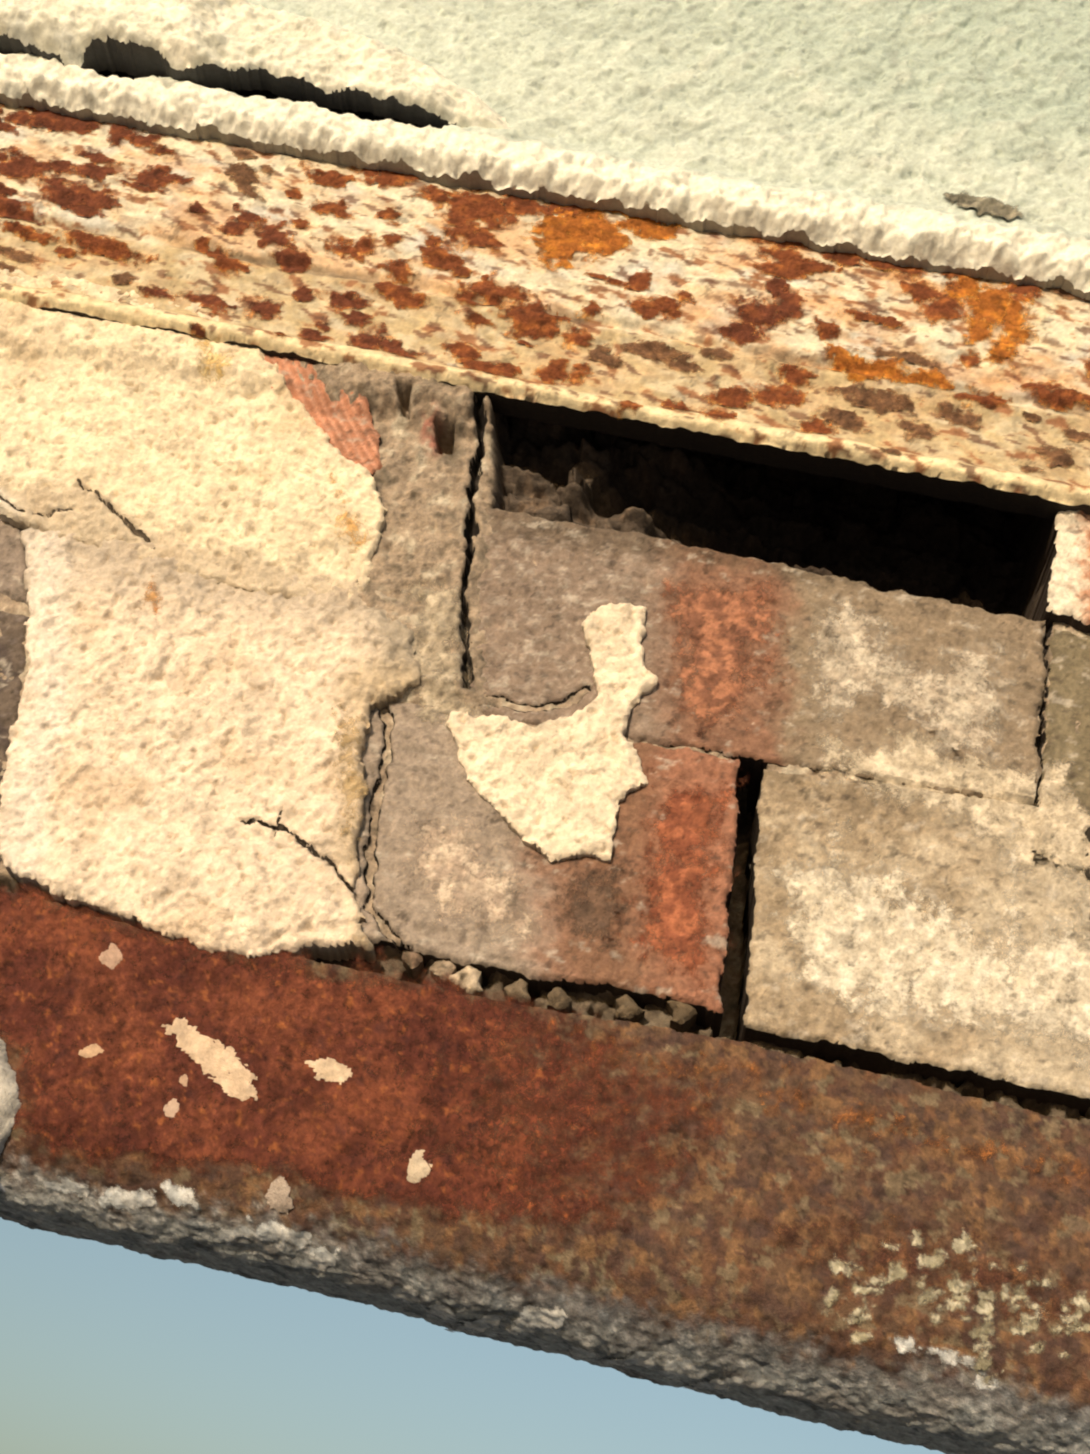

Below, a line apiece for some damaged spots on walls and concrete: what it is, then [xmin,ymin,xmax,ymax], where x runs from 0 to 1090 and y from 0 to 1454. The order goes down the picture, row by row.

corrosion [0,103,1090,473]
crack [459,393,591,713]
crack [240,710,413,952]
crack [1082,827,1090,879]
corrosion [0,885,726,1229]
corrosion [766,1209,1090,1333]